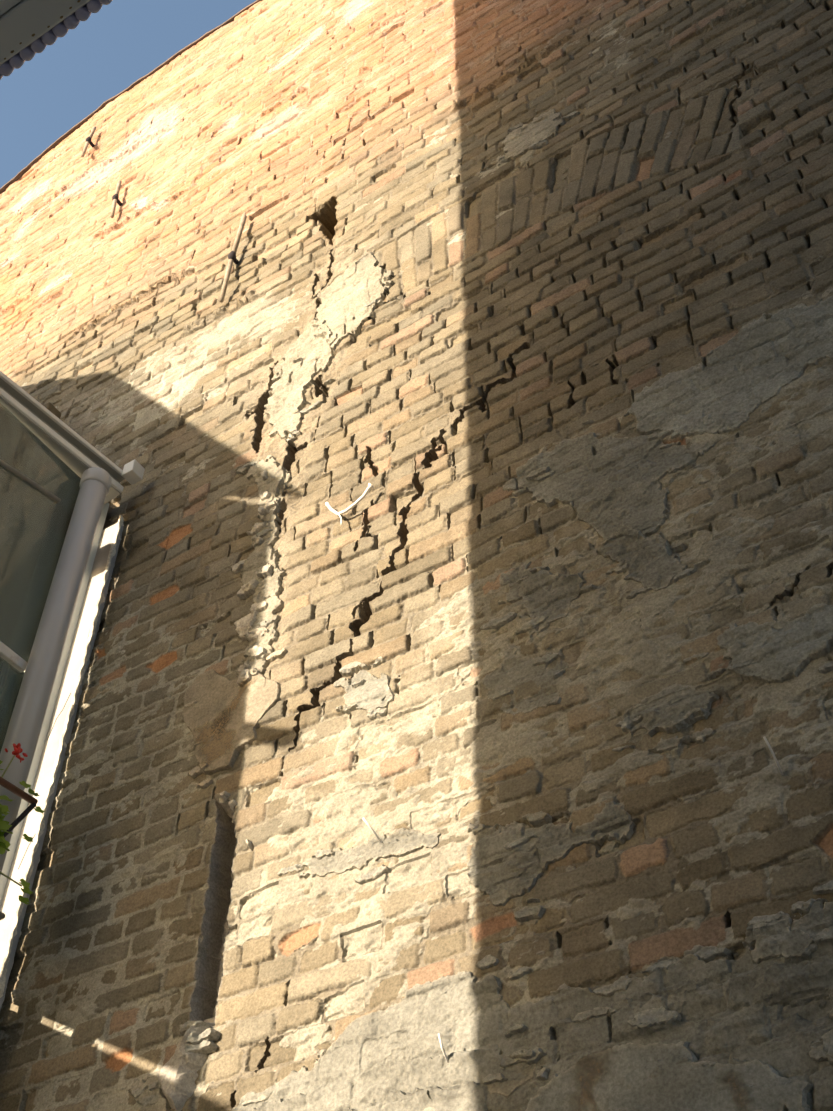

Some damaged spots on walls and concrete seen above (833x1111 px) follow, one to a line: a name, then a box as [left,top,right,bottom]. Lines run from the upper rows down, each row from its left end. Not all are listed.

crack [310,249,334,323]
peeling [294,401,323,415]
crack [244,360,308,532]
peeling [285,430,302,448]
crack [288,342,531,752]
peeling [266,648,288,663]
peeling [612,707,717,753]
peeling [468,824,490,835]
spalling [469,897,545,943]
peeling [746,880,833,930]
peeling [572,945,732,1023]
flaking render [482,1006,813,1111]